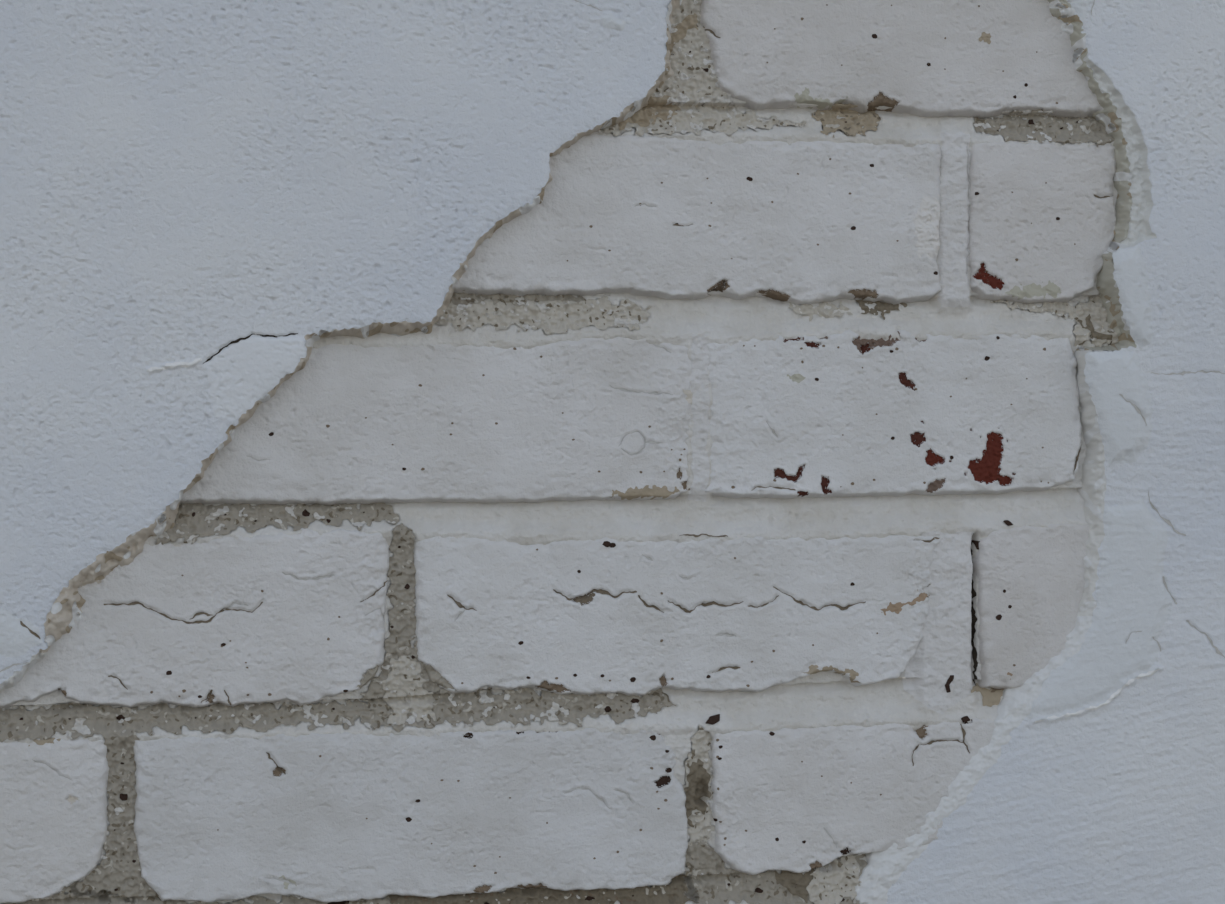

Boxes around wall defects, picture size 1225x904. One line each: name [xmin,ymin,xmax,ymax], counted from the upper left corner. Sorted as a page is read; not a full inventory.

peeling [549,0,899,156]
spalling [973,0,1157,248]
crack [204,333,298,363]
crack [104,602,263,624]
crack [282,572,335,581]
crack [553,576,866,637]
crack [945,535,978,693]